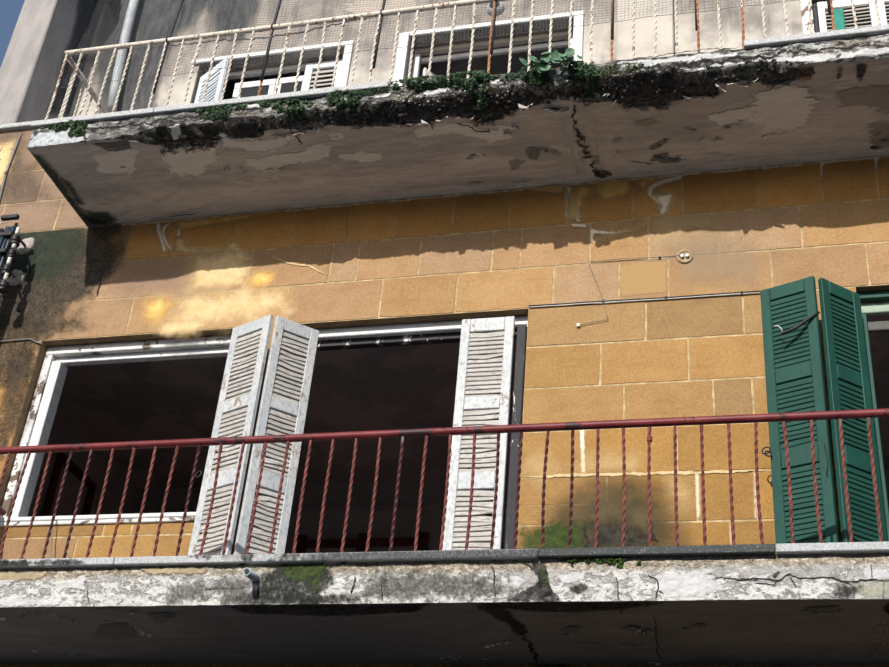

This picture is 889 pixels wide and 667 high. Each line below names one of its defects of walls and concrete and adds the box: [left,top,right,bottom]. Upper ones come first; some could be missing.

peeling [91,149,141,175]
spalling [139,47,889,180]
crack [551,96,600,170]
water stain [565,156,889,241]
water stain [0,155,533,338]
water stain [525,430,763,547]
peeling [0,575,86,607]
water stain [223,569,429,617]
crack [492,566,550,665]
crack [715,568,889,615]